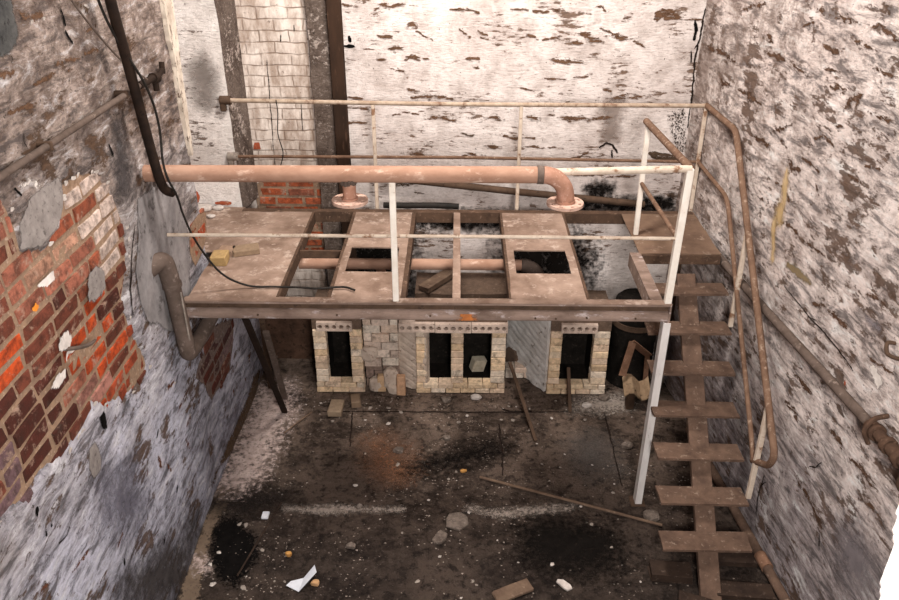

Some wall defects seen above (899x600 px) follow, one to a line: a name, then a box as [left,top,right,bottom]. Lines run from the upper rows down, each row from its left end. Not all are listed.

peeling [572,12,646,48]
peeling [835,15,899,42]
peeling [344,35,429,72]
peeling [544,57,593,80]
crack [687,8,706,128]
peeling [825,68,863,112]
peeling [526,114,610,123]
peeling [462,135,564,156]
peeling [751,123,820,173]
flaking render [256,182,322,209]
flaking render [0,170,152,523]
flaking render [178,318,234,427]